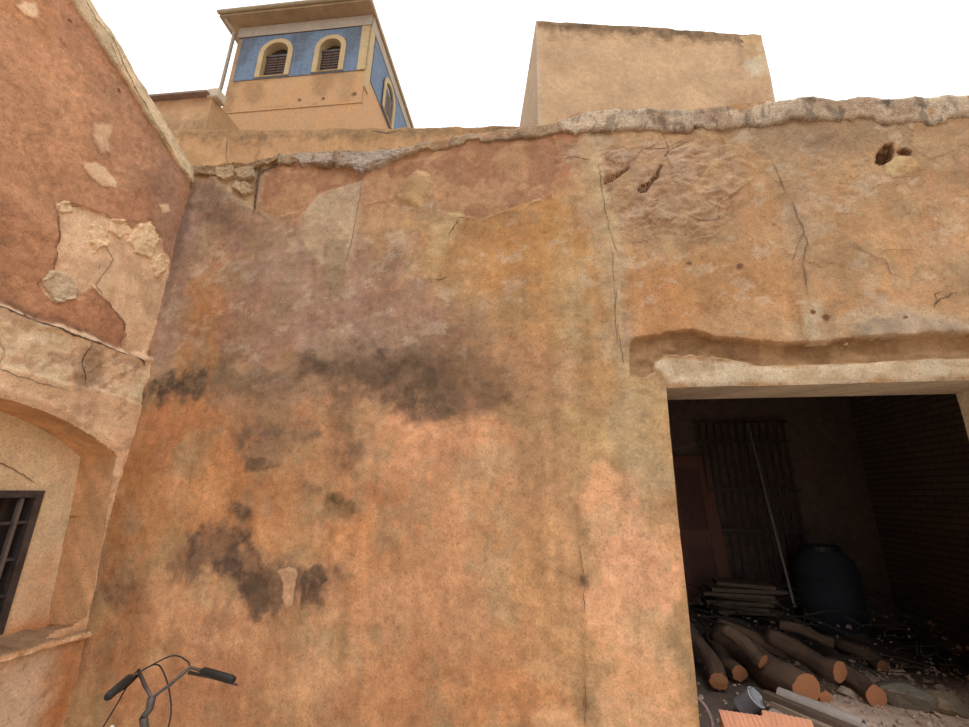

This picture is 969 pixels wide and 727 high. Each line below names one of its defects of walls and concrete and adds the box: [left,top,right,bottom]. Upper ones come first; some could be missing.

crack [86,1,169,144]
crack [0,306,147,392]
spalling [82,120,119,190]
spalling [38,198,172,361]
crack [560,145,657,363]
crack [625,138,688,173]
crack [773,164,809,296]
peeling [883,146,922,179]
damp [141,322,527,533]
damp [91,493,363,662]